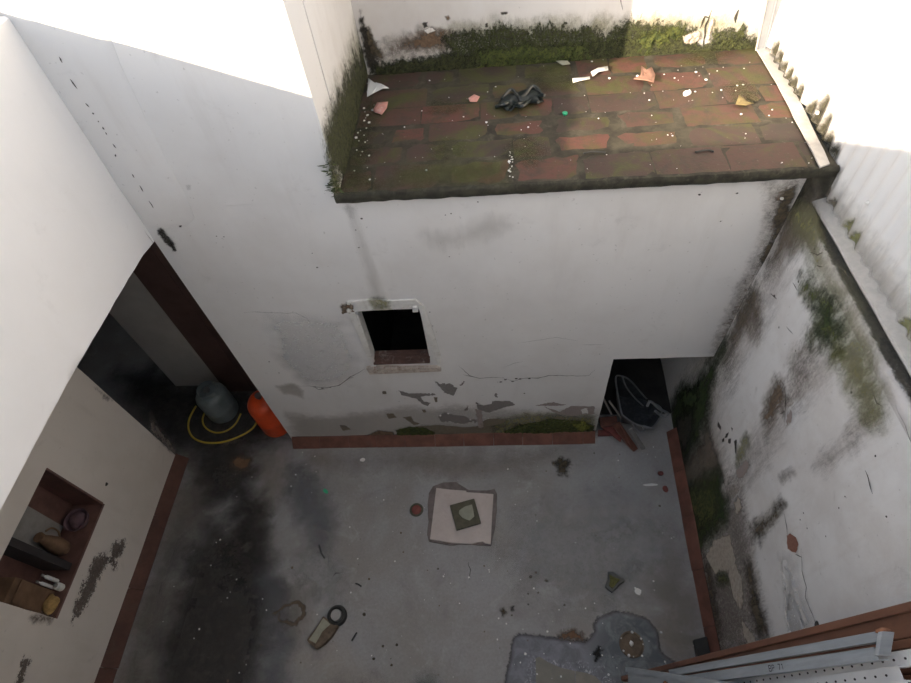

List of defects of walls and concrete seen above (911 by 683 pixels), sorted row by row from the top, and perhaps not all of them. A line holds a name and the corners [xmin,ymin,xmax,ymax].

water stain [351,18,450,75]
water stain [717,183,813,352]
peeling [398,380,464,412]
peeling [439,393,515,428]
crack [460,367,573,382]
water stain [761,379,789,429]
water stain [114,367,276,683]
water stain [750,499,786,544]
crack [783,554,819,626]